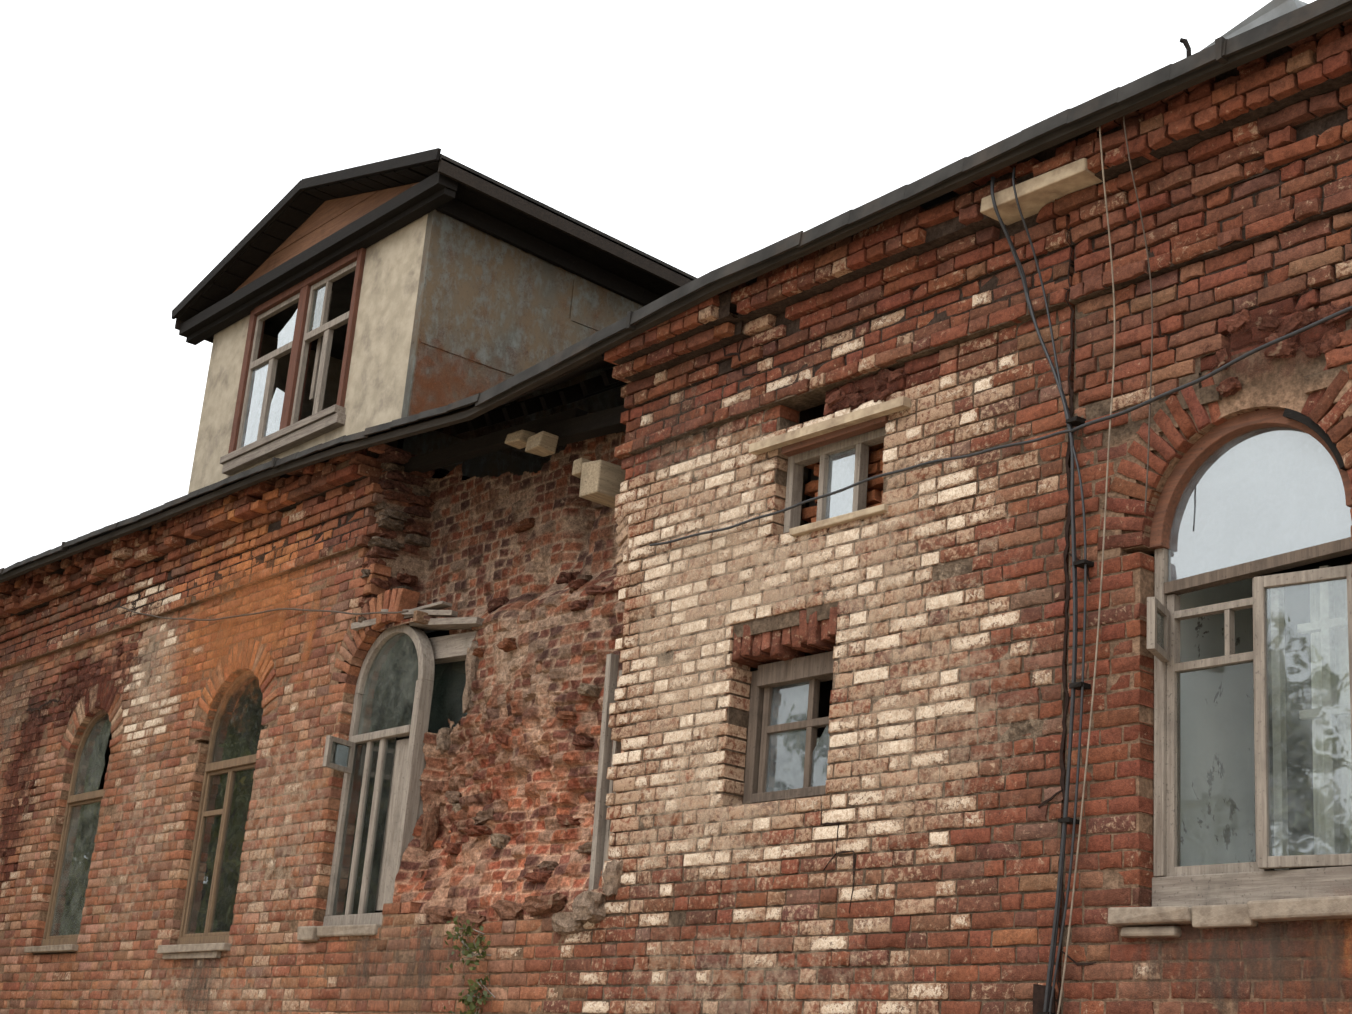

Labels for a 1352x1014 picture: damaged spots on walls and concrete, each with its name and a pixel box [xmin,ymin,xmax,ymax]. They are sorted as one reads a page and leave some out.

peeling [972,293,990,307]
spalling [349,337,1028,956]
peeling [582,1001,609,1013]
peeling [820,988,855,1014]
peeling [877,984,946,1014]